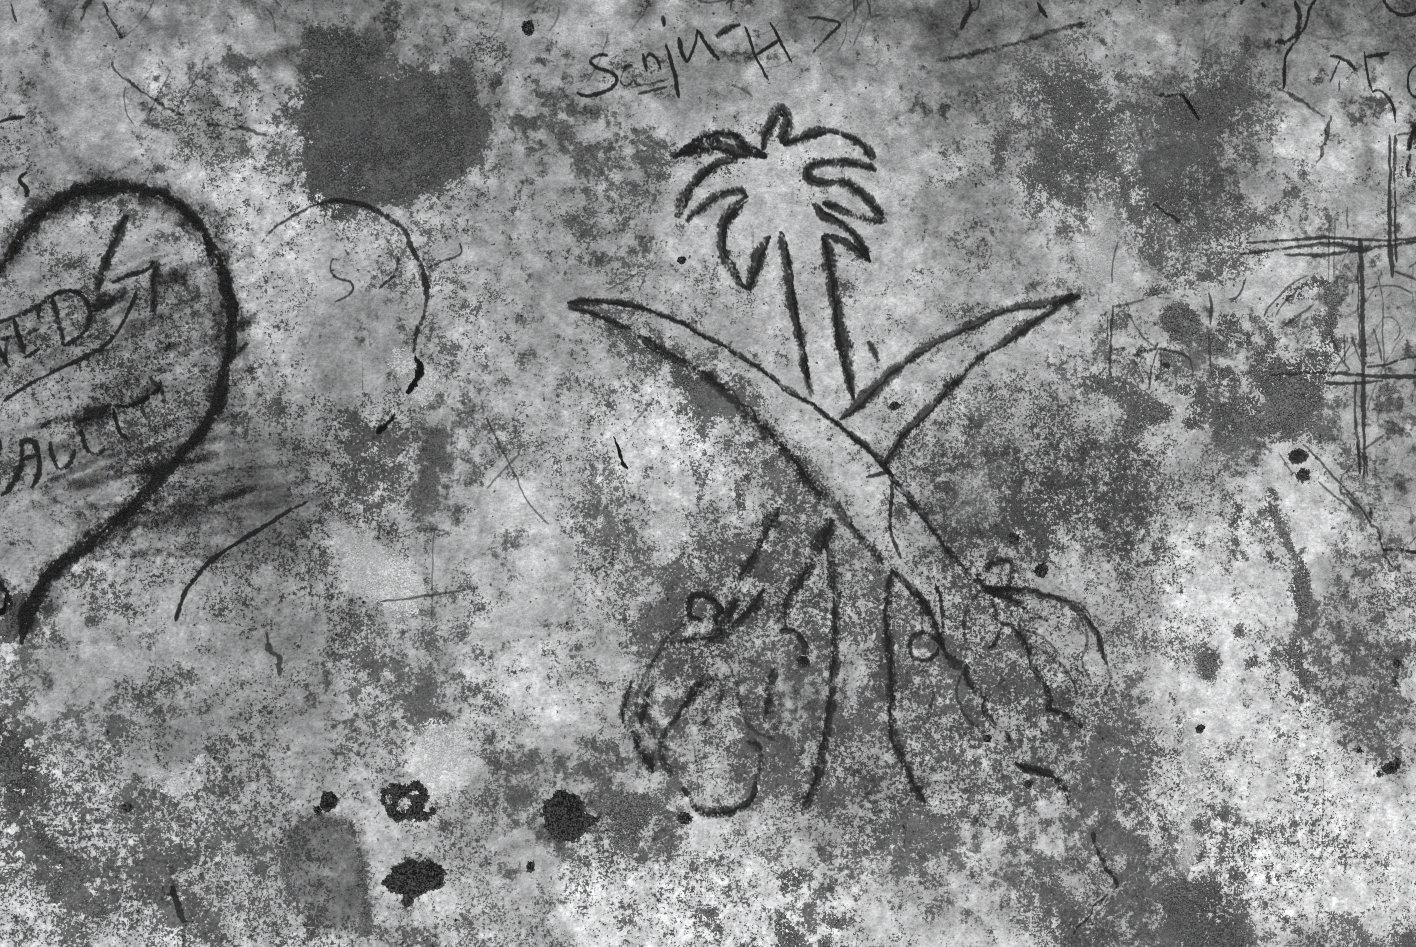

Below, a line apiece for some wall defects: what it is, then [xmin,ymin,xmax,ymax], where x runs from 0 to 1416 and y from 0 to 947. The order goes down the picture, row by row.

crack [0,590,9,615]